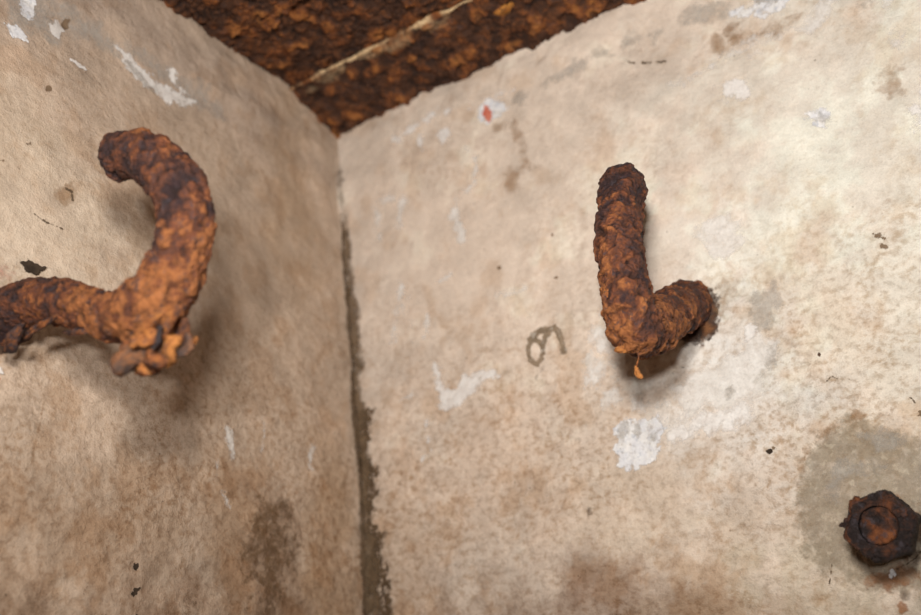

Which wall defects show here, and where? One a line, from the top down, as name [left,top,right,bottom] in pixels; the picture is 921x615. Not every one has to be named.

corrosion [493,2,514,17]
corrosion [0,314,59,354]
corrosion [109,304,199,378]
corrosion [682,288,720,346]
peeling [613,401,751,472]
corrosion [871,566,906,613]